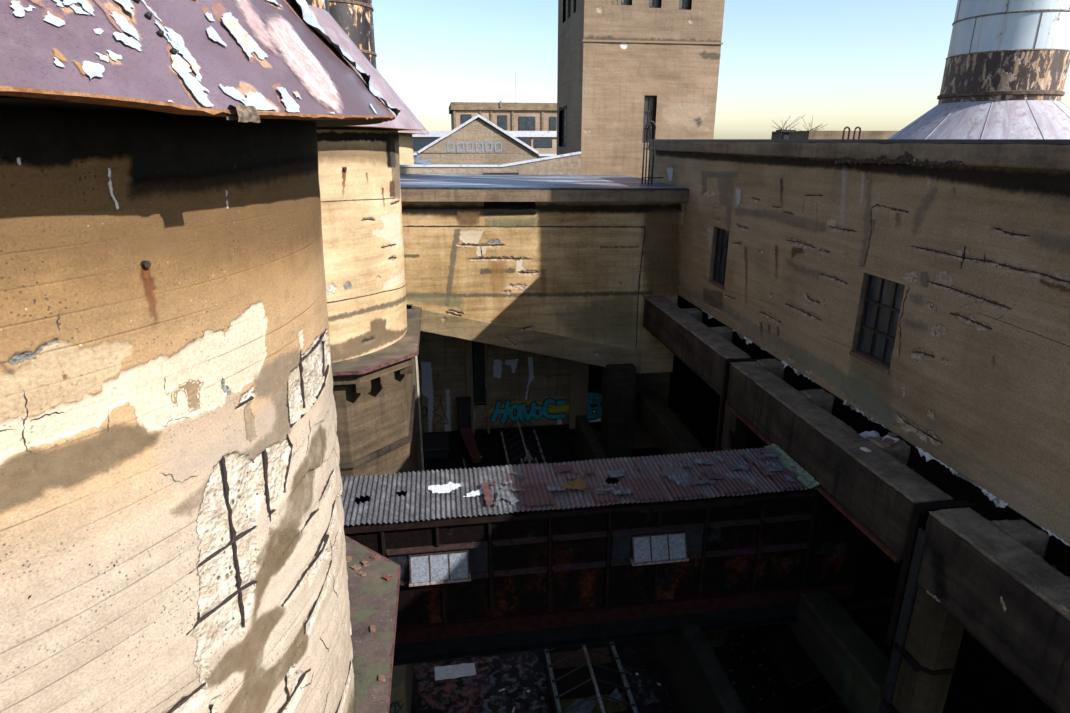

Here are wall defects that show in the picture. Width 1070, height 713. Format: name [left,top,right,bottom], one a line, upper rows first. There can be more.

peeling [10,0,301,113]
peeling [265,0,401,116]
corrosion [140,260,155,305]
peeling [457,230,541,295]
crack [861,204,909,266]
crack [0,390,68,452]
water stain [0,426,158,510]
spalling [0,302,330,713]
water stain [176,500,193,513]
water stain [206,426,326,713]
water stain [241,351,300,459]
spalling [280,469,339,637]